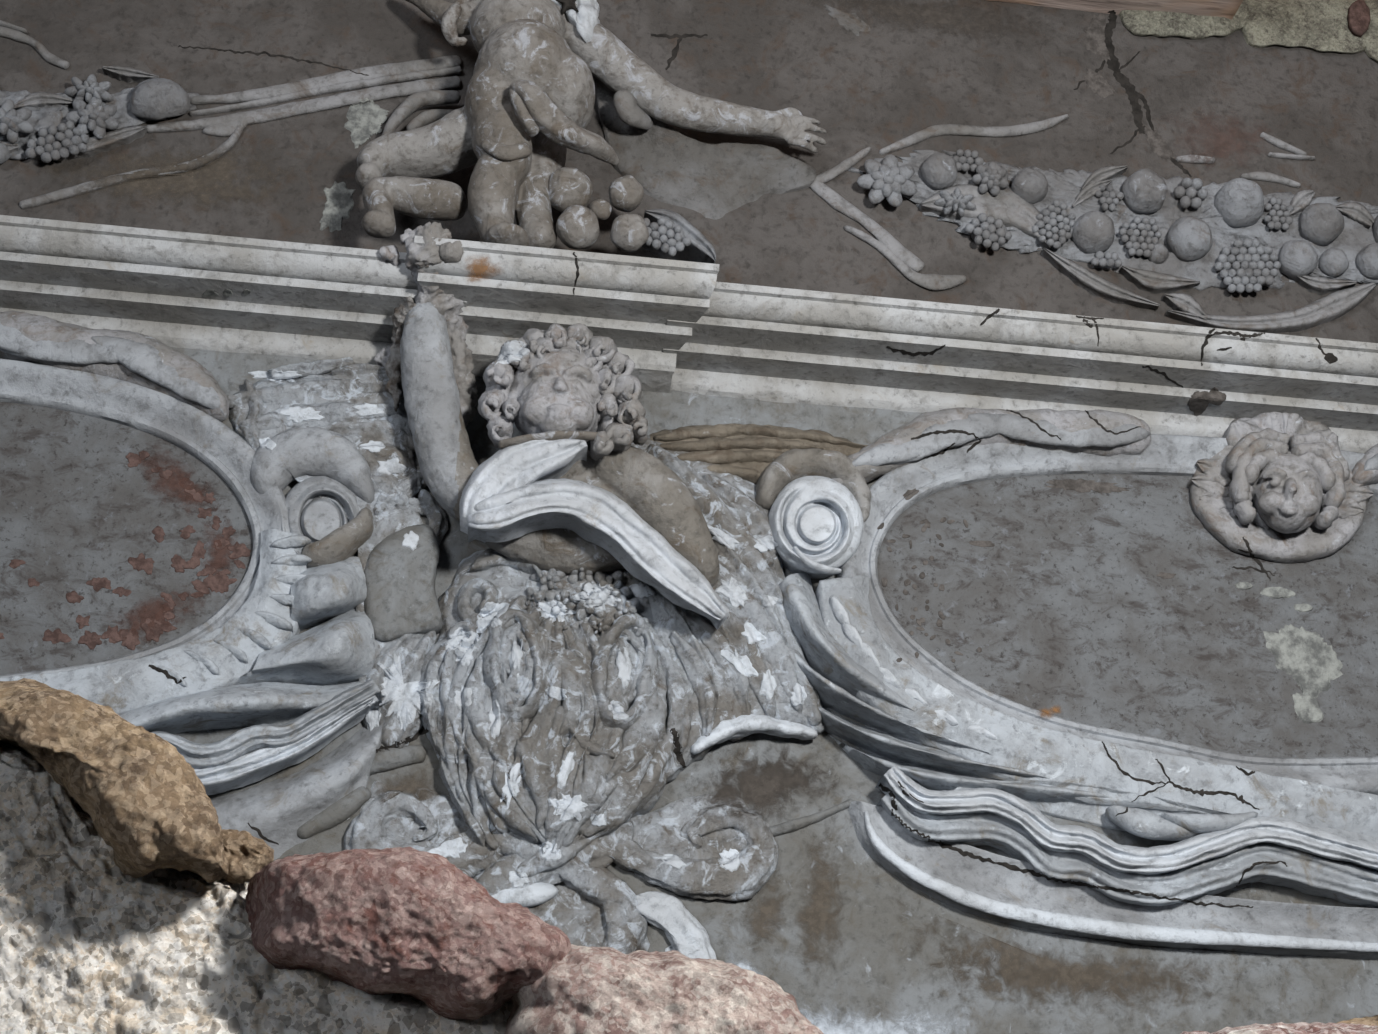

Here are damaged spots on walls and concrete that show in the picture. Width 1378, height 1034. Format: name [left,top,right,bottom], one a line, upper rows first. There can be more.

crack [1074,10,1192,177]
crack [980,308,1000,325]
crack [1076,315,1104,346]
crack [1142,328,1265,388]
crack [1315,338,1338,364]
crack [1006,409,1061,440]
crack [1085,410,1141,435]
crack [911,429,981,459]
water stain [377,774,432,801]
water stain [711,749,837,817]
crack [1102,741,1260,816]
water stain [749,847,840,960]